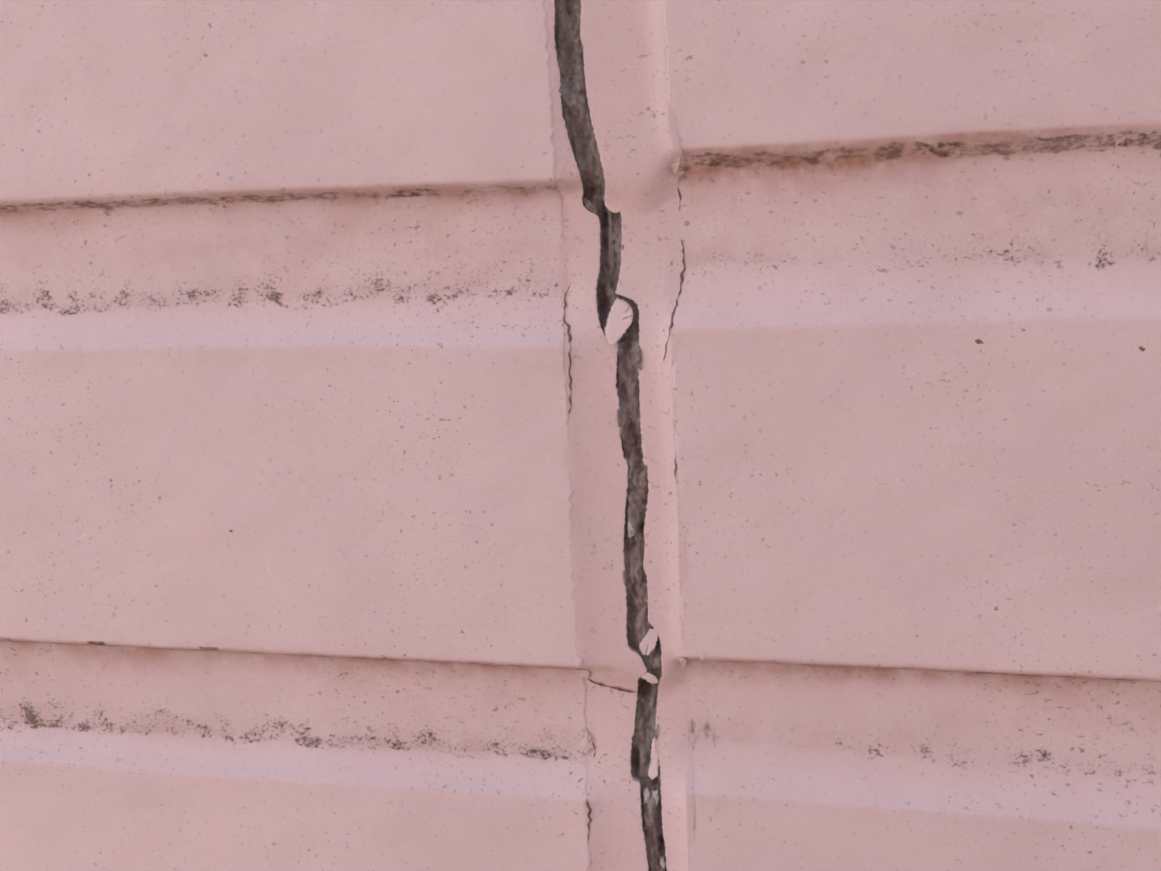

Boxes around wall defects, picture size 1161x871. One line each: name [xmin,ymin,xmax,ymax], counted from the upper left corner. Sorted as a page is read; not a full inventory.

leakage [0,281,129,314]
leakage [149,285,287,307]
crack [554,0,686,871]
leakage [4,702,135,733]
leakage [224,721,331,748]
leakage [488,743,568,761]